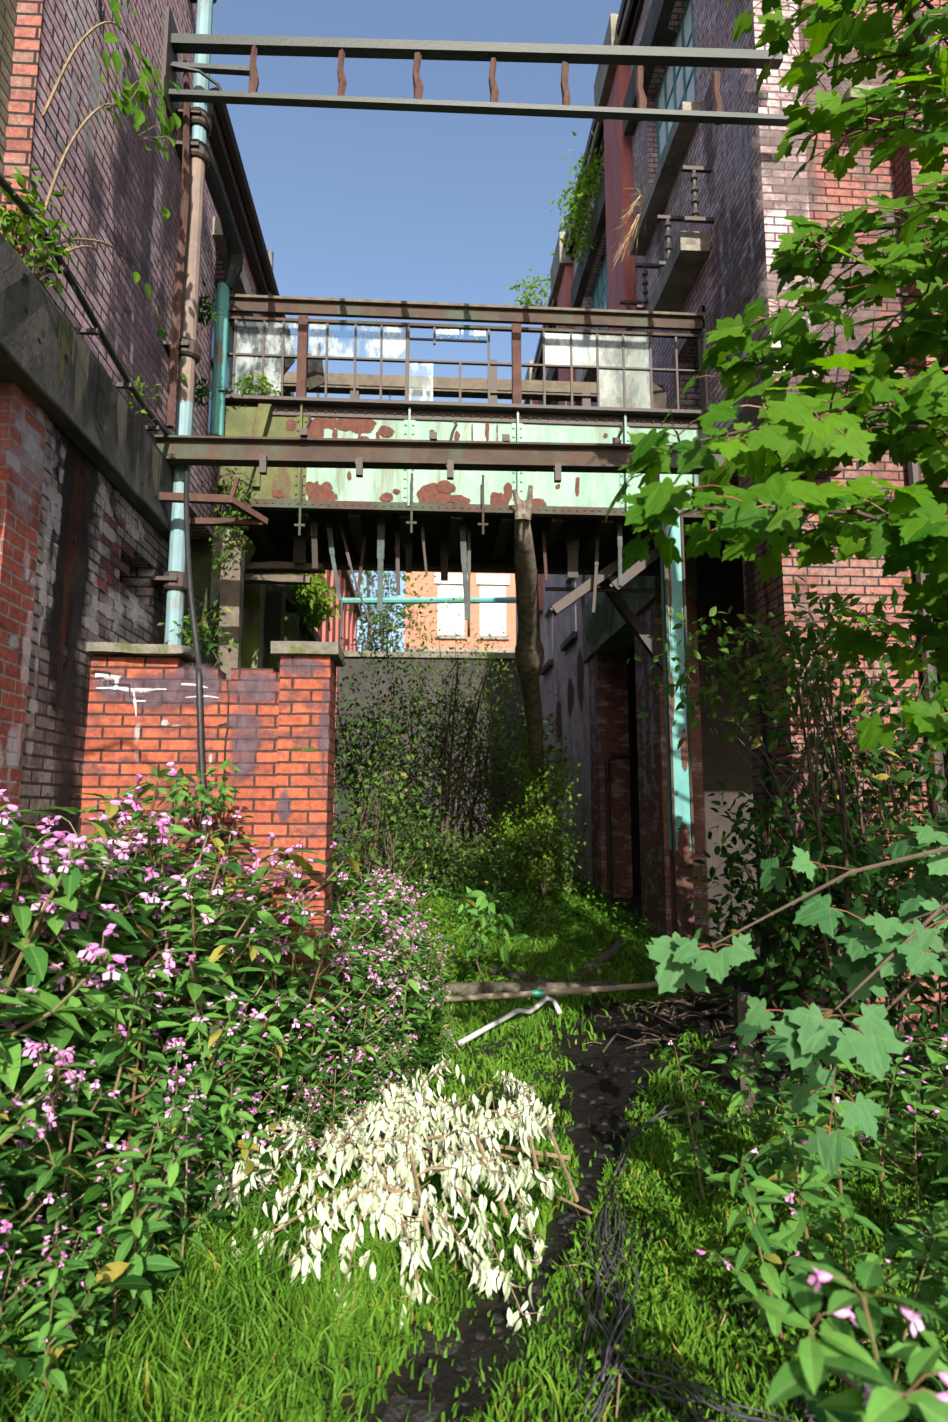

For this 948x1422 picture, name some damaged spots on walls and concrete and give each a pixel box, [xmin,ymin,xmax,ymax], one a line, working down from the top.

leakage [0,407,64,783]
spalling [96,494,134,600]
leakage [98,484,143,553]
leakage [82,563,164,719]
leakage [34,777,81,859]